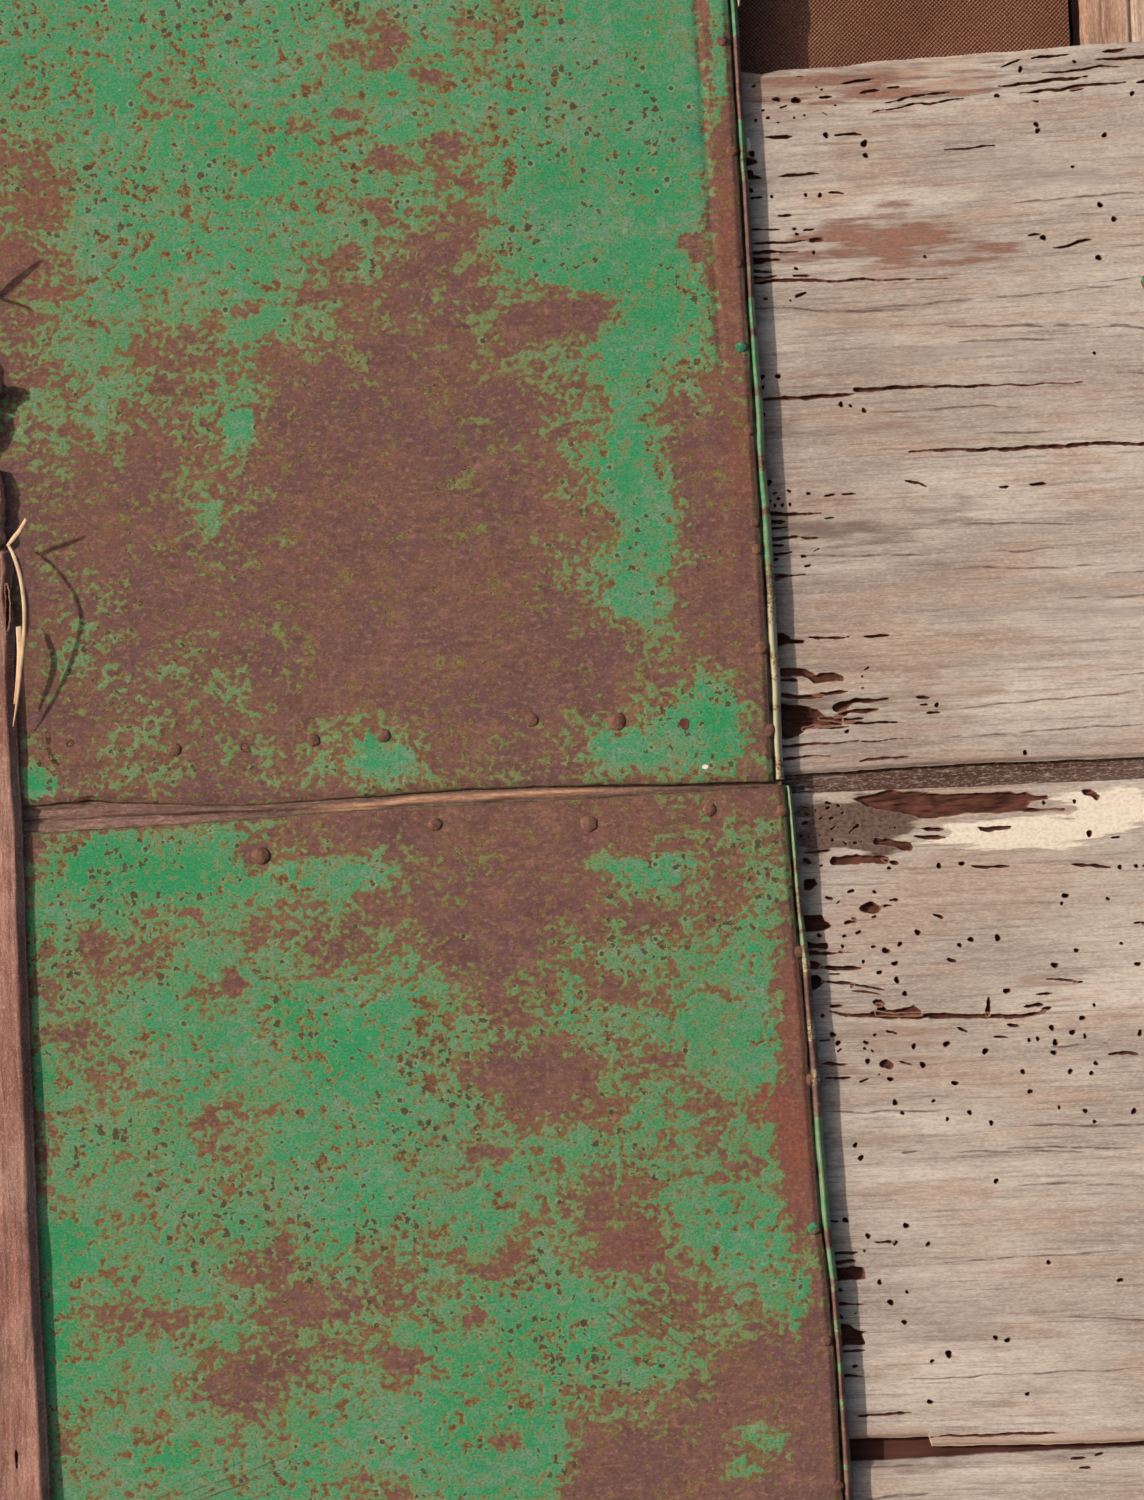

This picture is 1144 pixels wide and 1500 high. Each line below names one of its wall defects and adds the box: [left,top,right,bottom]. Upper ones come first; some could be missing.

crack [873,91,964,112]
crack [998,55,1144,94]
crack [754,245,1144,342]
crack [762,381,1144,453]
crack [968,522,1141,598]
corrosion [0,0,841,1500]
peeling [1081,789,1100,801]
crack [829,997,1076,1048]